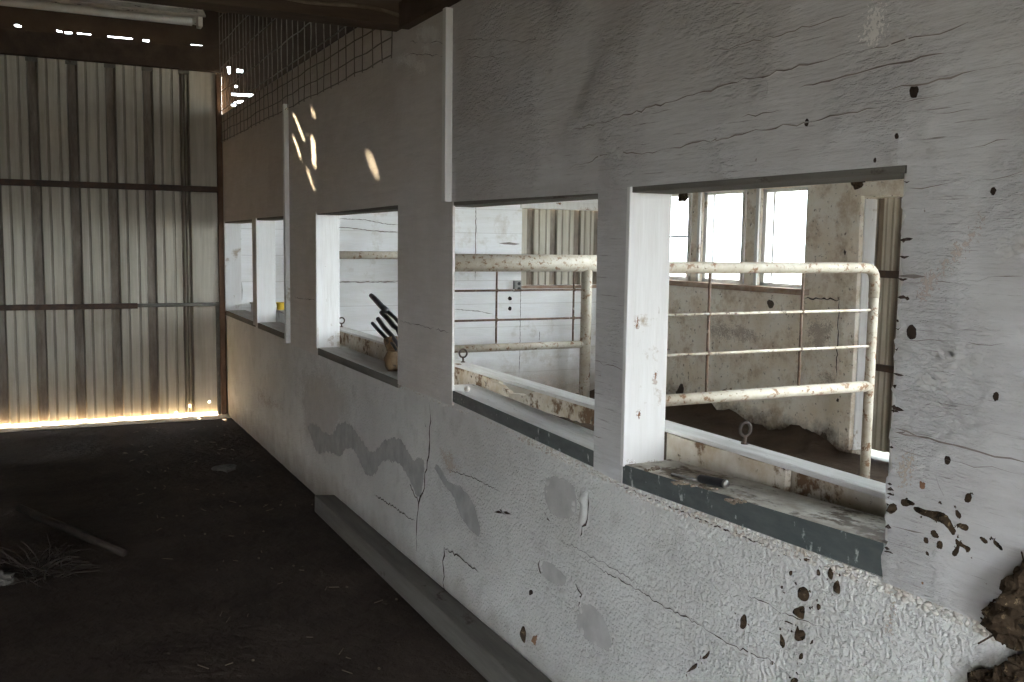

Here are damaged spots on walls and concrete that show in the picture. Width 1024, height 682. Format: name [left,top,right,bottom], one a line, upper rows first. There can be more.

crack [707,6,862,54]
crack [566,22,1021,170]
peeling [308,421,480,536]
crack [375,403,511,552]
crack [442,547,478,589]
crack [544,512,793,682]
flaking render [402,386,1024,653]